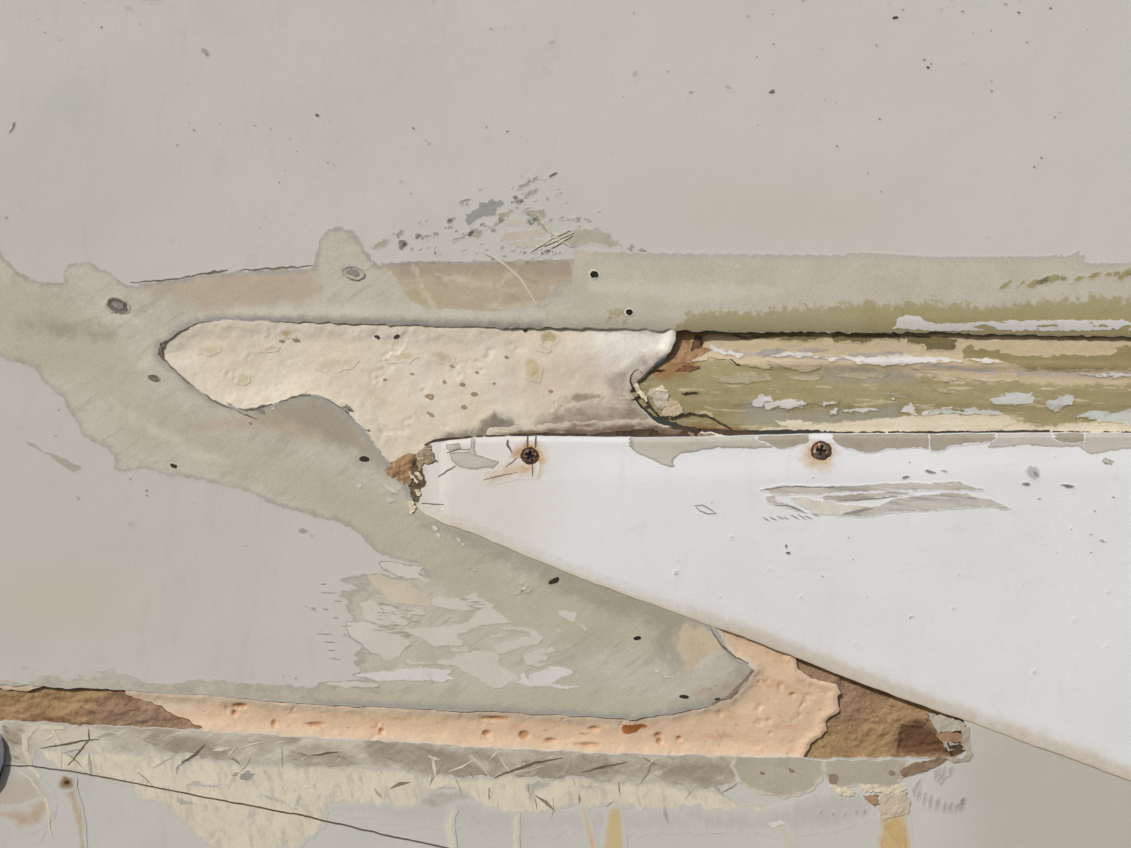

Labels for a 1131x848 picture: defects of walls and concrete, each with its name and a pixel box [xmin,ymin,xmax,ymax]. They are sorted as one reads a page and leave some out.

corrosion [483,437,549,487]
corrosion [794,437,842,476]
peeling [0,171,1131,848]